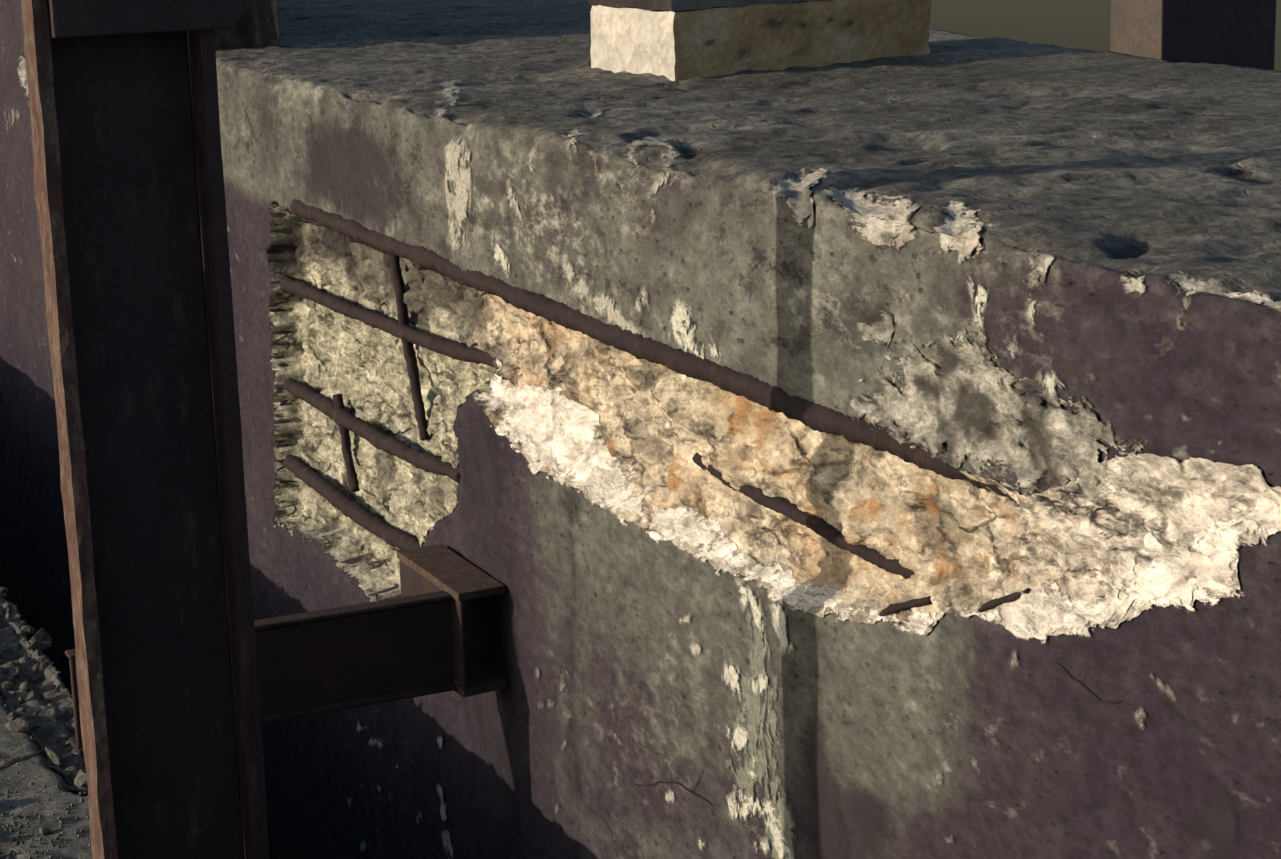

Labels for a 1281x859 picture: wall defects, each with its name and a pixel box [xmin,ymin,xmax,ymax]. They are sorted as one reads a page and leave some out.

spalling [17,54,30,105]
spalling [771,168,997,263]
spalling [1228,168,1272,185]
spalling [267,198,1281,643]
leakage [724,580,794,859]